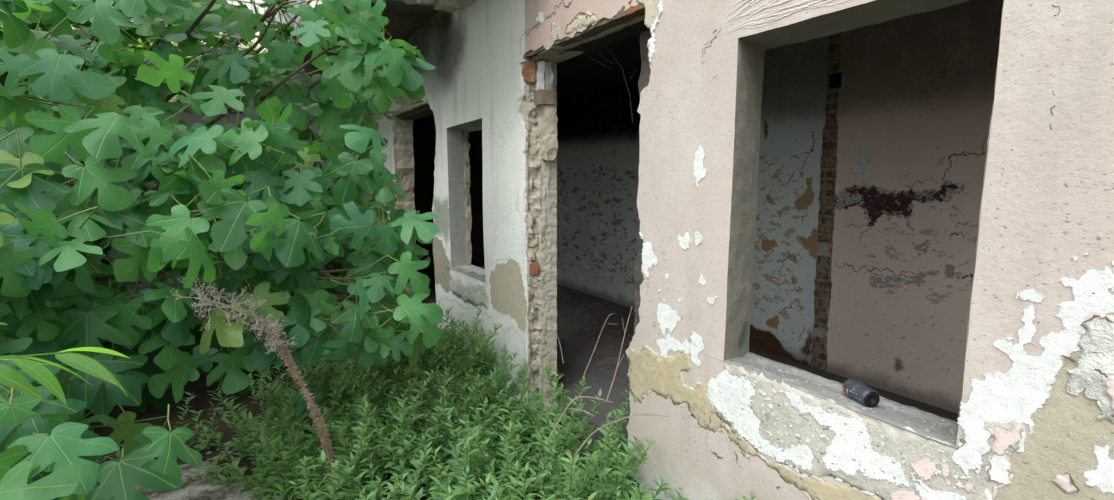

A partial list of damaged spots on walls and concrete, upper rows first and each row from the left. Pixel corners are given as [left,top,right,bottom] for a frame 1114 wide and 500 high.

crack [519,1,598,47]
flaking render [536,11,598,40]
flaking render [636,0,663,63]
peeling [693,144,706,189]
flaking render [751,32,978,371]
flaking render [433,205,528,333]
flaking render [556,166,1114,500]